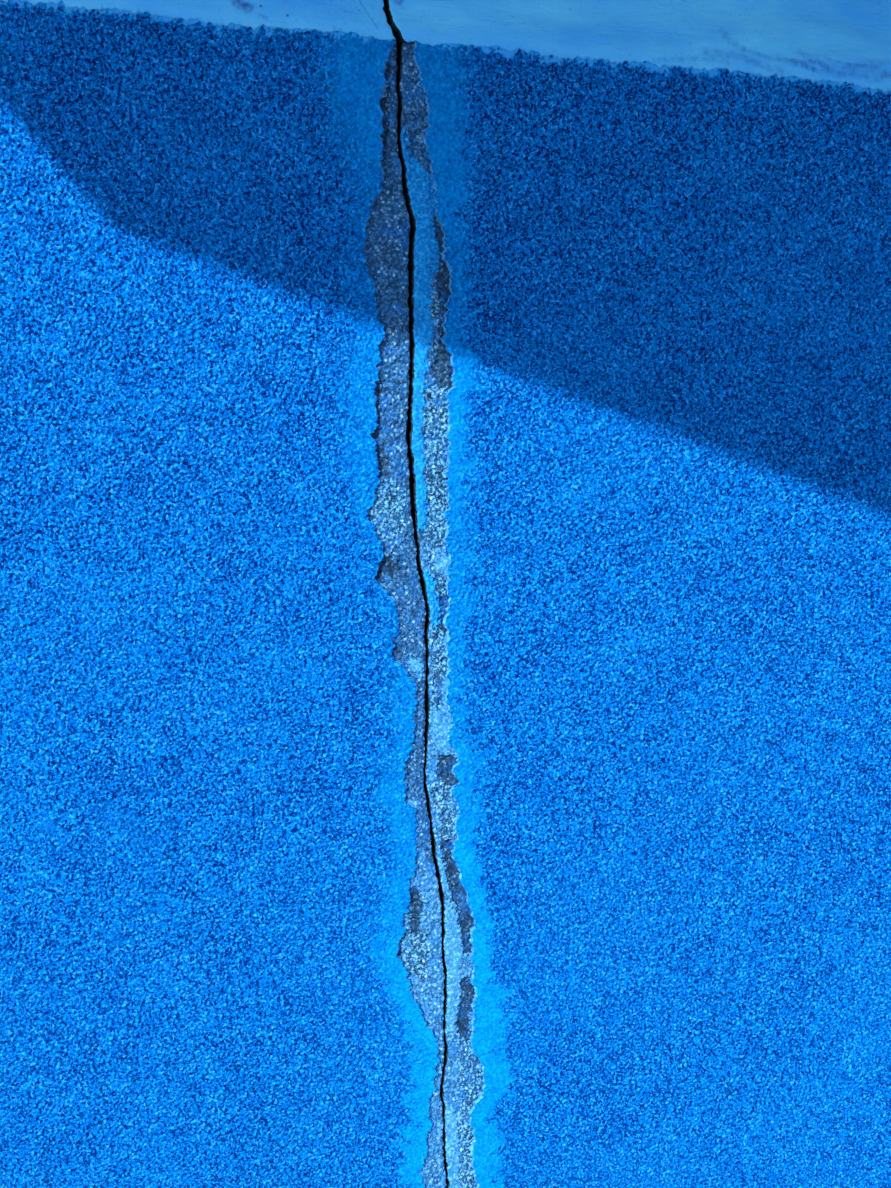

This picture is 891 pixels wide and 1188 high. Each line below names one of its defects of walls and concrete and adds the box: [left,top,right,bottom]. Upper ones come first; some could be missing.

crack [383,0,450,1188]
spalling [362,40,486,1188]